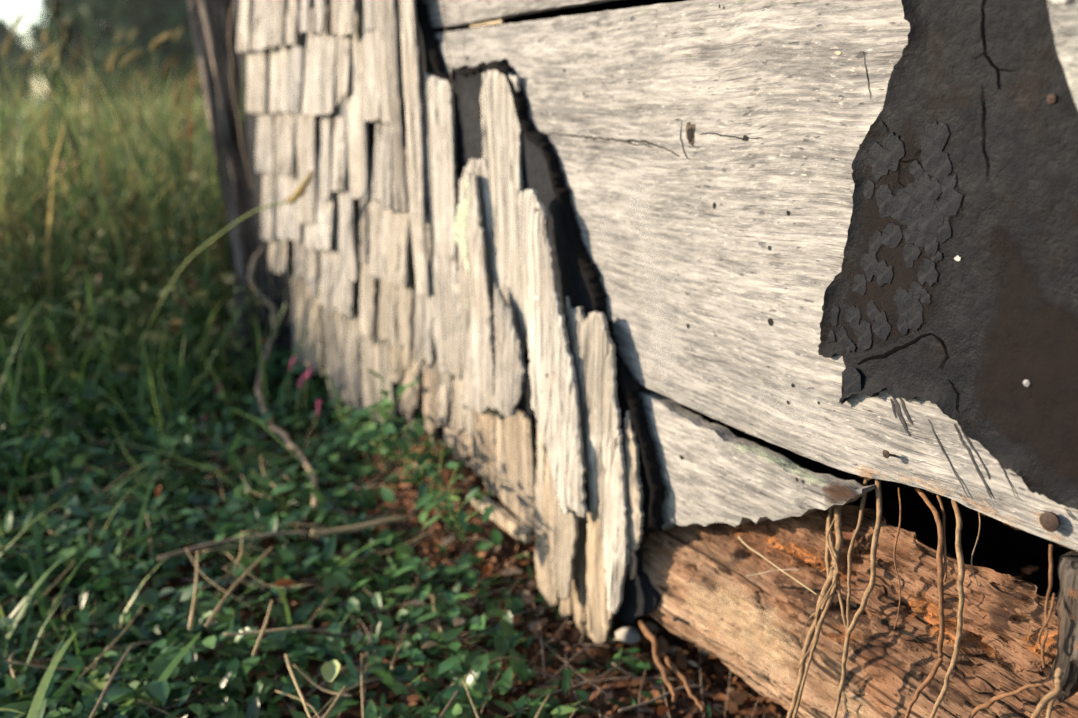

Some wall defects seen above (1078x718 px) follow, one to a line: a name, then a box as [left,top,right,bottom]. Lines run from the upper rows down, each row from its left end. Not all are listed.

crack [973,0,1013,182]
crack [544,121,761,160]
spalling [890,397,912,436]
spalling [928,419,969,498]
spalling [954,424,992,499]